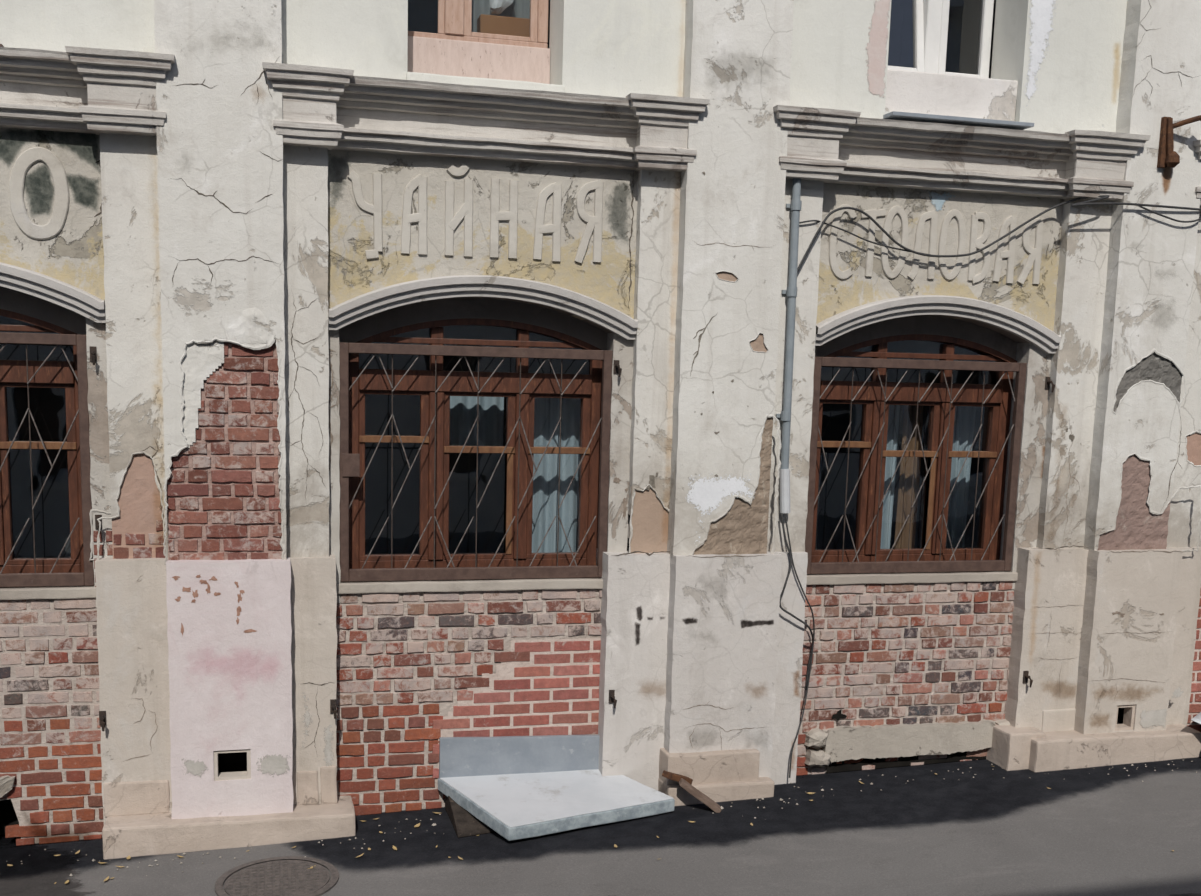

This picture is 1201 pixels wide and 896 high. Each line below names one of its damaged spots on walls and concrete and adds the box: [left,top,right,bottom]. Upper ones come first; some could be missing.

crack [173,56,280,97]
crack [1133,3,1200,95]
crack [171,178,274,214]
crack [690,314,717,377]
spalling [1112,348,1186,414]
spalling [89,334,286,603]
spalling [613,473,669,553]
spalling [690,414,781,555]
spalling [1096,453,1201,552]
spalling [1185,430,1201,467]
peeling [234,581,256,633]